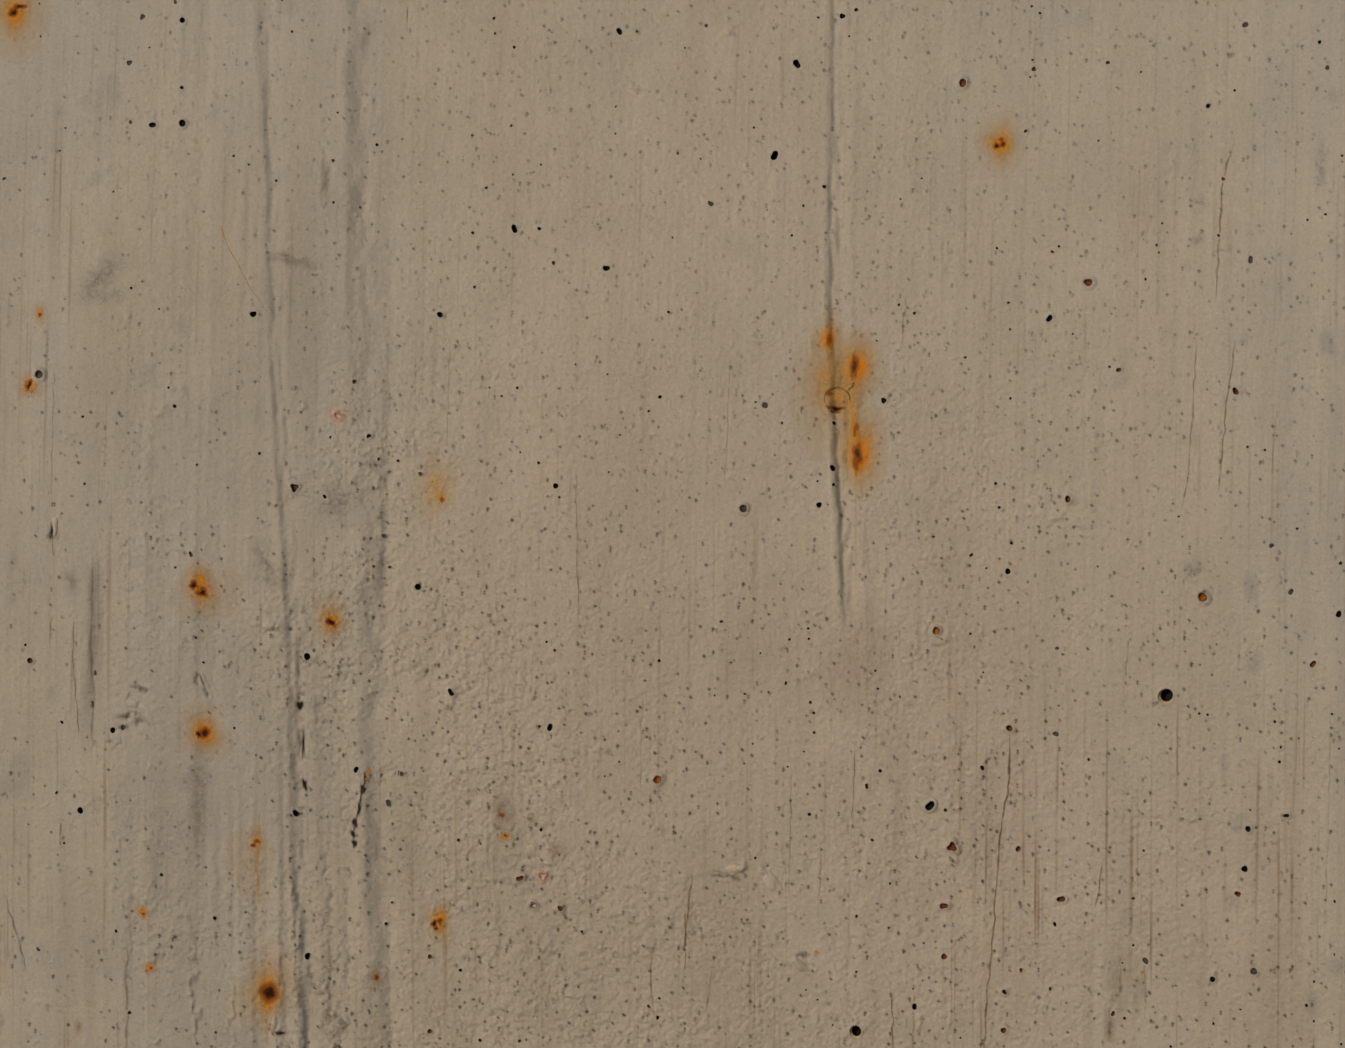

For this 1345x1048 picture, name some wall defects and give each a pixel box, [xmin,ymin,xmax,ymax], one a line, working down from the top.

corrosion [7,2,26,23]
corrosion [993,135,1008,153]
corrosion [821,327,834,351]
corrosion [824,351,871,474]
corrosion [189,576,208,599]
corrosion [195,725,213,742]
corrosion [431,913,444,931]
corrosion [260,979,278,1007]